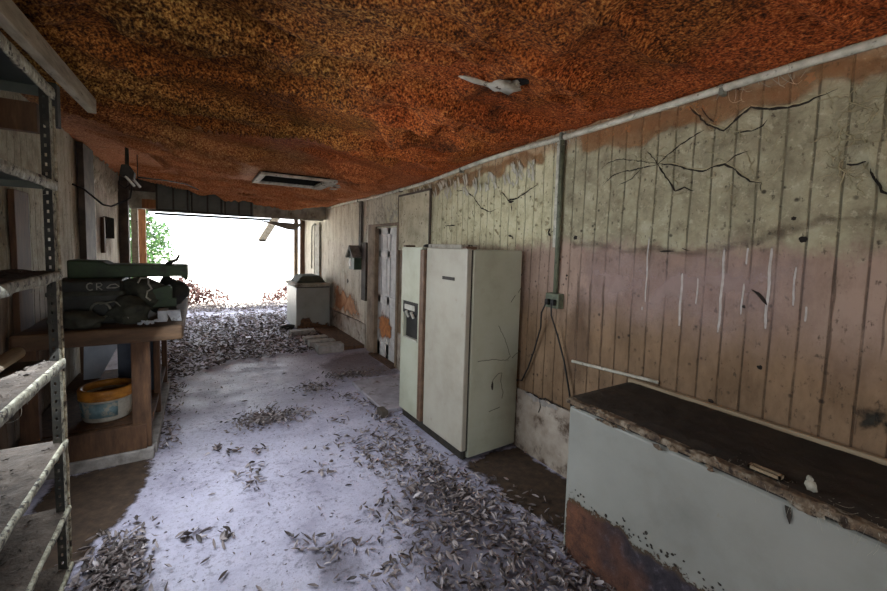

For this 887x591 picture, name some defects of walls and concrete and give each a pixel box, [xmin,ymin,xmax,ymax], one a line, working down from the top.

crack [605,87,838,192]
crack [457,185,537,212]
mould [855,410,887,428]
corrosion [564,489,724,591]